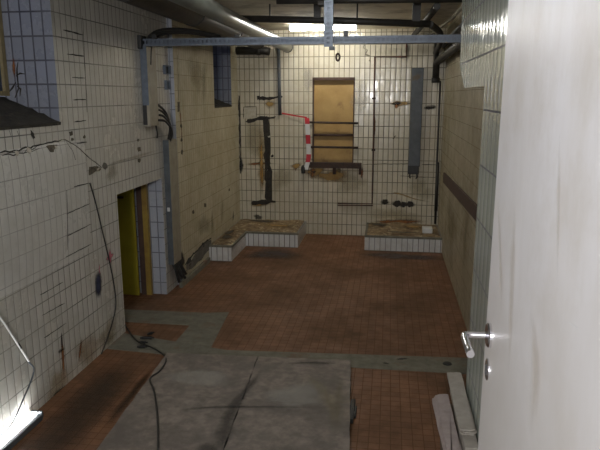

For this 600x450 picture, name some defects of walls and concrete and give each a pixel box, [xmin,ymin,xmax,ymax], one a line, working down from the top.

crack [64,16,86,81]
crack [0,139,101,167]
spalling [185,238,211,271]